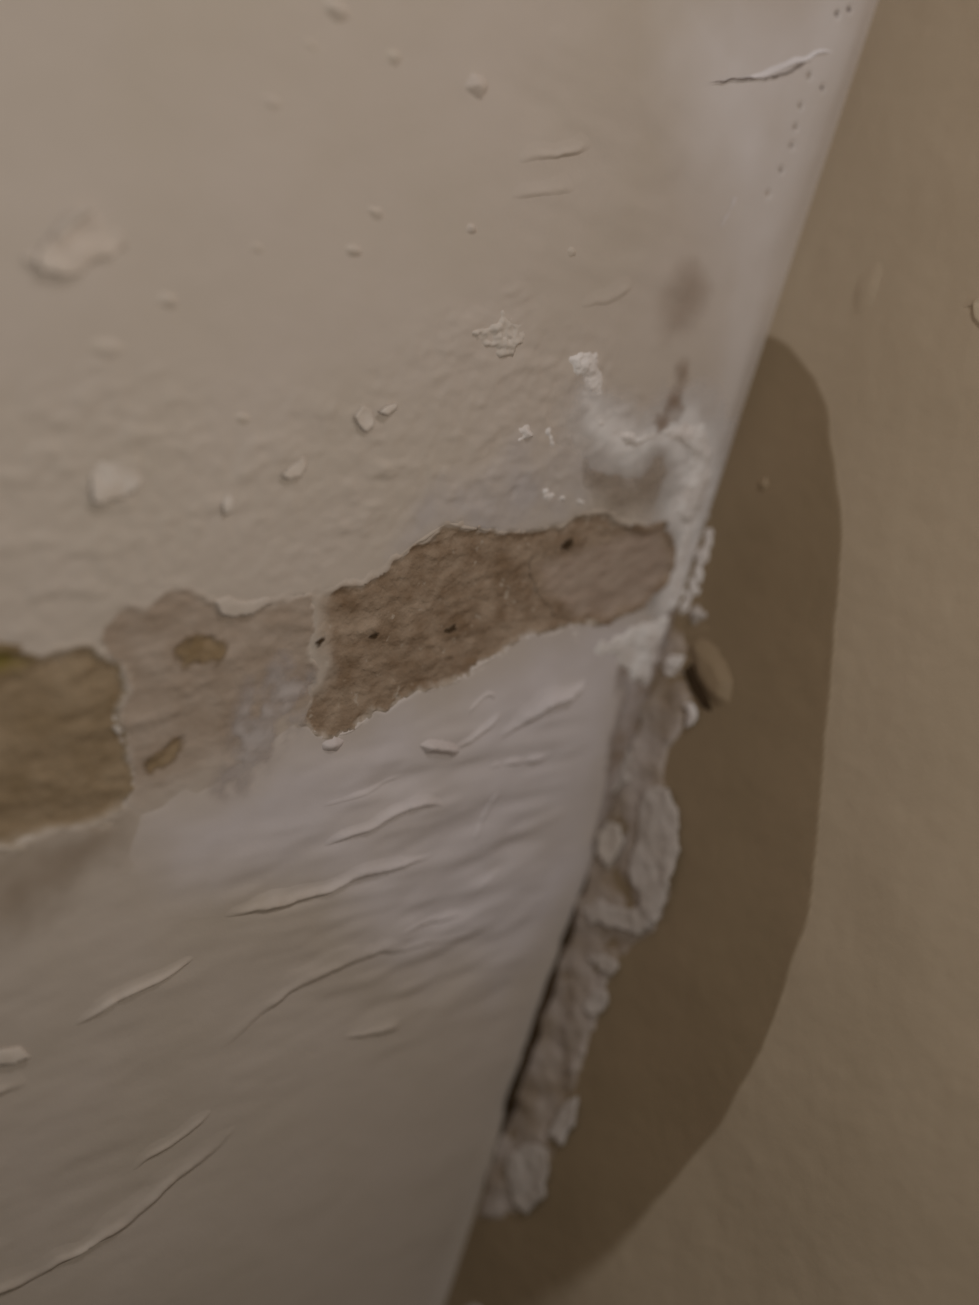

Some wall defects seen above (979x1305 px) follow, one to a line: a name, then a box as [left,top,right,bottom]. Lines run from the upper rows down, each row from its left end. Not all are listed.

peeling [23,205,127,277]
peeling [0,1046,31,1065]
flaking render [0,507,676,856]
leakage [0,332,846,1305]
flaking render [476,606,698,1219]